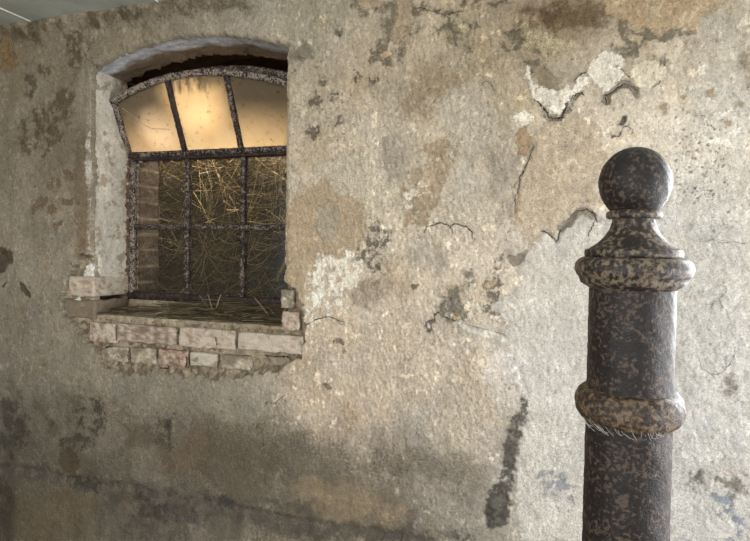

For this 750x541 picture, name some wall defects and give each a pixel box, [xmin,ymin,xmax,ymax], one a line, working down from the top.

crack [514,143,536,213]
crack [424,222,473,239]
crack [541,207,598,243]
peeling [46,21,666,541]
crack [433,311,506,336]
peeling [661,227,750,541]
leakage [0,397,470,541]
leakage [502,430,517,471]
leakage [487,485,510,530]